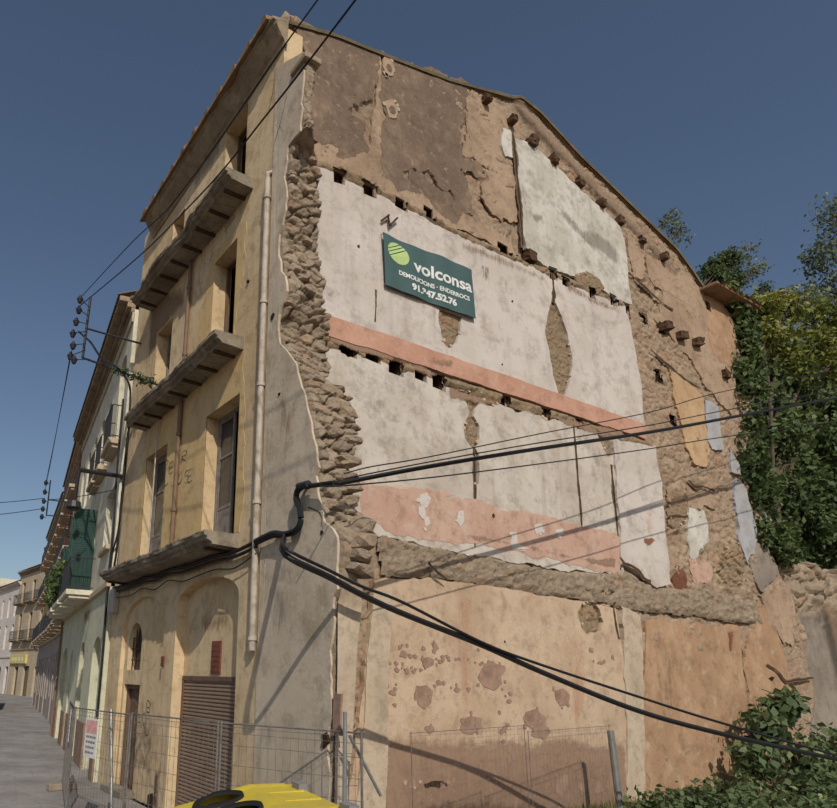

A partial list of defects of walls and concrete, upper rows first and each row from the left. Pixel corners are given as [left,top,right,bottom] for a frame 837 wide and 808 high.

peeling [382,56,395,78]
crack [512,133,527,246]
spalling [545,303,572,395]
peeling [416,493,431,531]
spalling [666,488,687,533]
spalling [715,542,748,587]
spalling [578,600,602,634]
peeling [389,640,512,709]
peeling [552,686,570,709]
peeling [460,711,482,735]
peeling [523,707,551,739]
water stain [386,740,626,808]